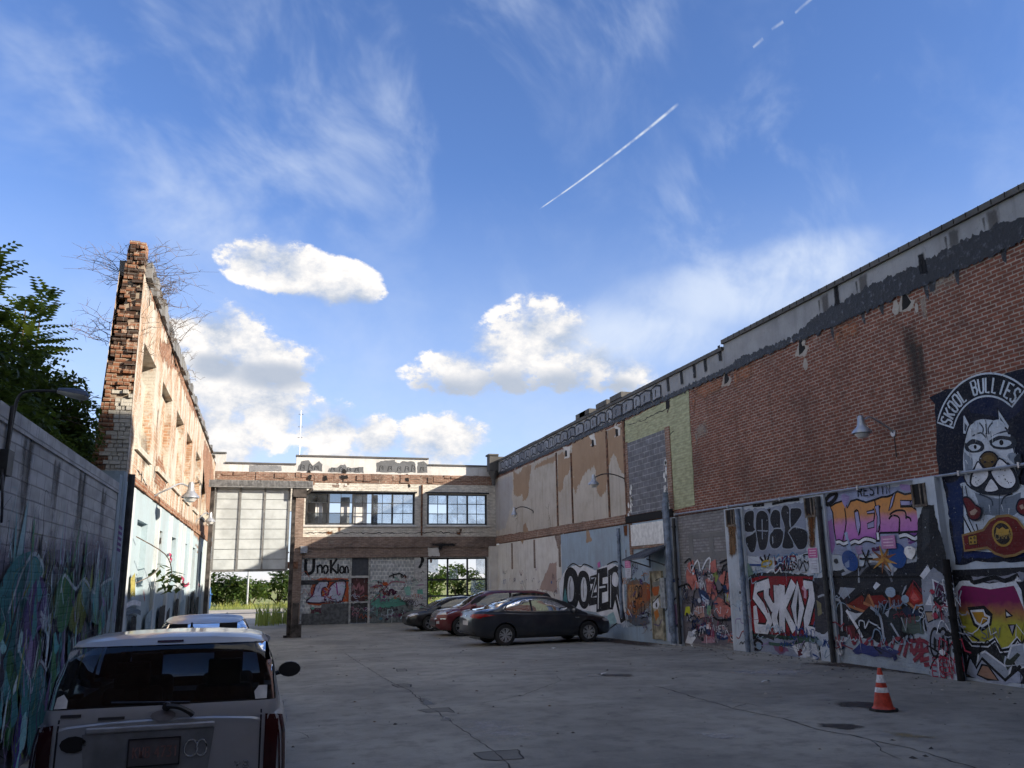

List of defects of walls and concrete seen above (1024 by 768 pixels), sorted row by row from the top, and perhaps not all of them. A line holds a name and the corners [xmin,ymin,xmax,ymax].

spalling [892,294,918,315]
water stain [918,254,955,315]
spalling [795,339,809,370]
spalling [189,419,625,553]